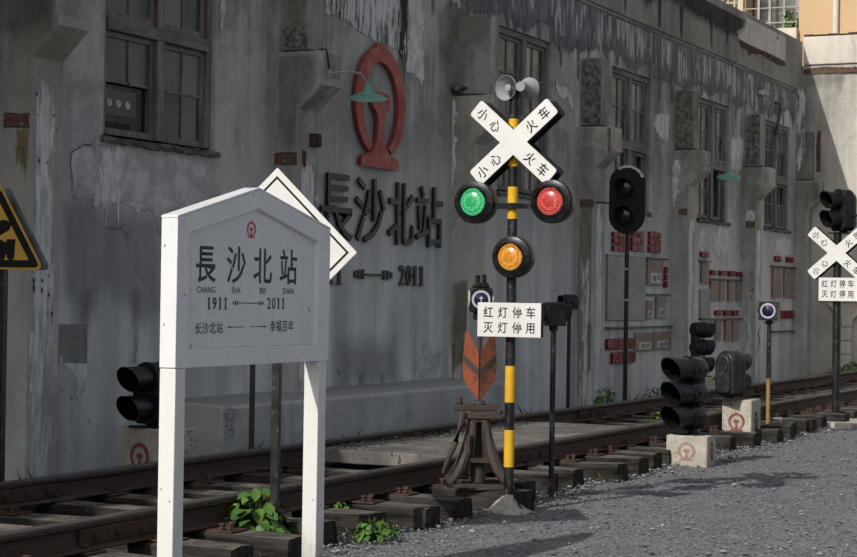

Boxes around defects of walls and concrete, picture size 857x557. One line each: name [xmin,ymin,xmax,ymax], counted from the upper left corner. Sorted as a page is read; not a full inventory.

peeling [325,0,425,85]
leakage [399,0,408,72]
leakage [450,0,796,127]
spalling [545,0,807,173]
corrosion [16,130,28,173]
flaking render [70,139,222,234]
peeling [3,83,88,477]